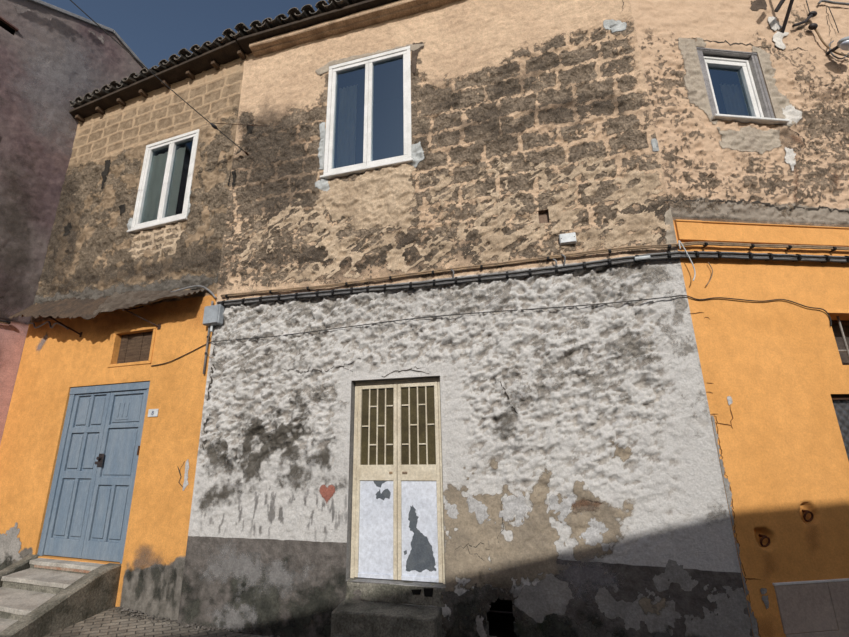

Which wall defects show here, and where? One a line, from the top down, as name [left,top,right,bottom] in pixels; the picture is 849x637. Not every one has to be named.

spalling [36,21,849,296]
peeling [585,265,673,302]
peeling [658,288,698,356]
crack [382,366,429,377]
peeling [491,320,661,407]
leakage [199,394,331,509]
peeling [0,522,22,565]
leakage [204,545,293,587]
leakage [268,498,283,522]
peeling [412,467,634,637]
peeling [558,411,759,637]
leakage [215,604,257,631]